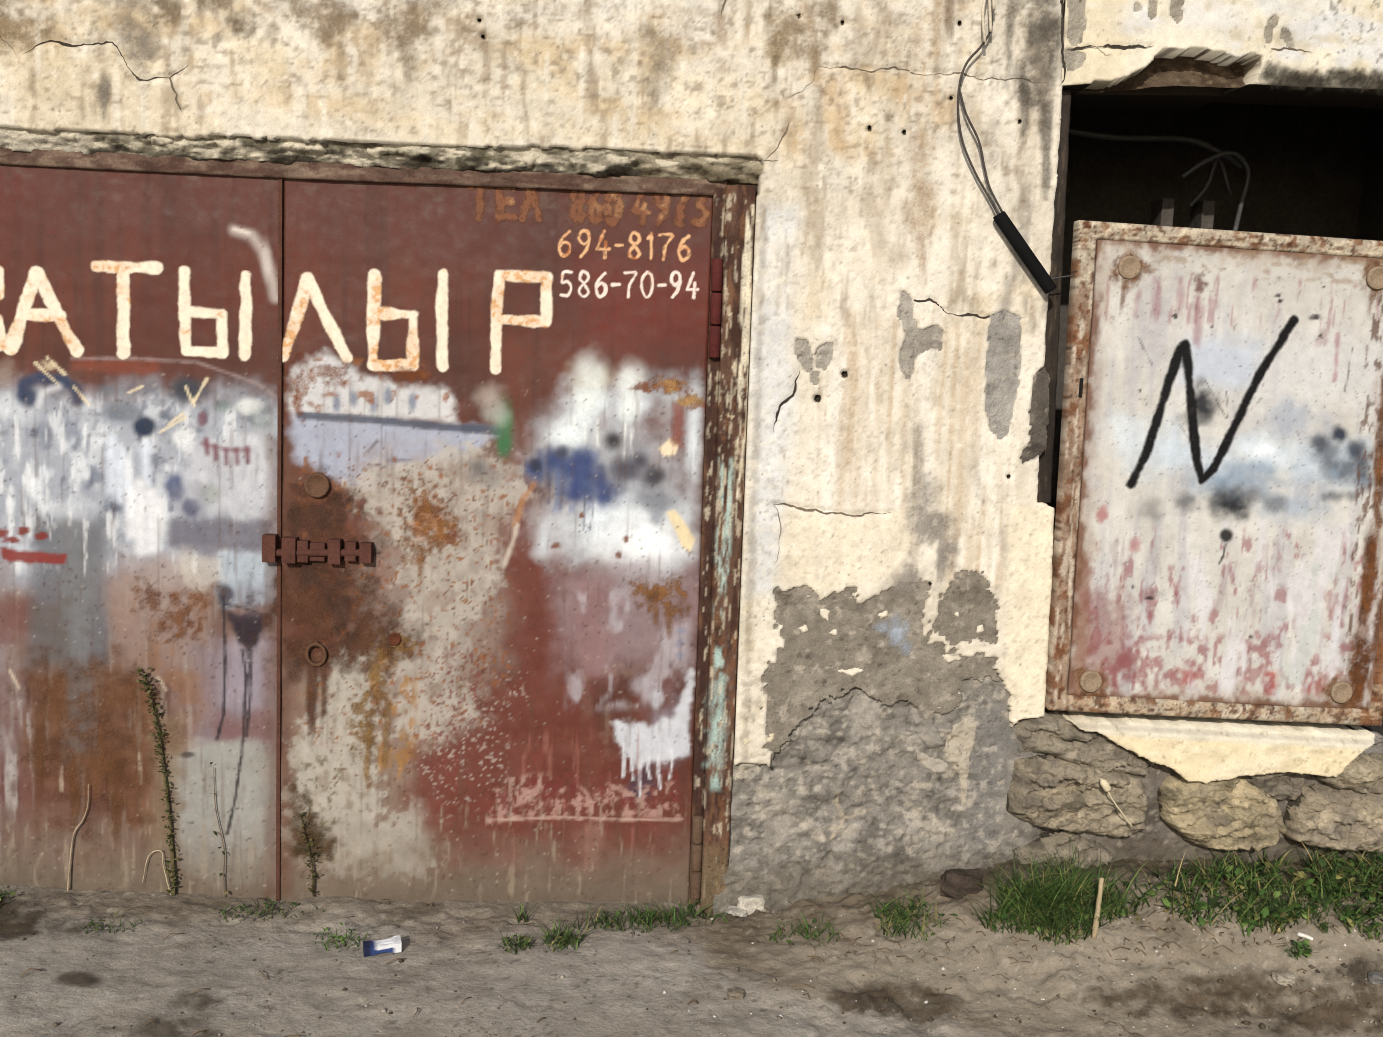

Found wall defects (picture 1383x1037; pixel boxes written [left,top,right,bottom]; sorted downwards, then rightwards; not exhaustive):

crack [0,37,188,110]
leakage [125,0,177,60]
leakage [391,1,440,58]
crack [764,0,1154,161]
crack [1271,45,1310,53]
leakage [1264,65,1383,89]
peeling [897,291,943,379]
peeling [984,310,1050,464]
rust [1361,388,1383,616]
rust [265,479,418,778]
rust [1323,633,1376,707]
flaking render [712,570,1045,914]